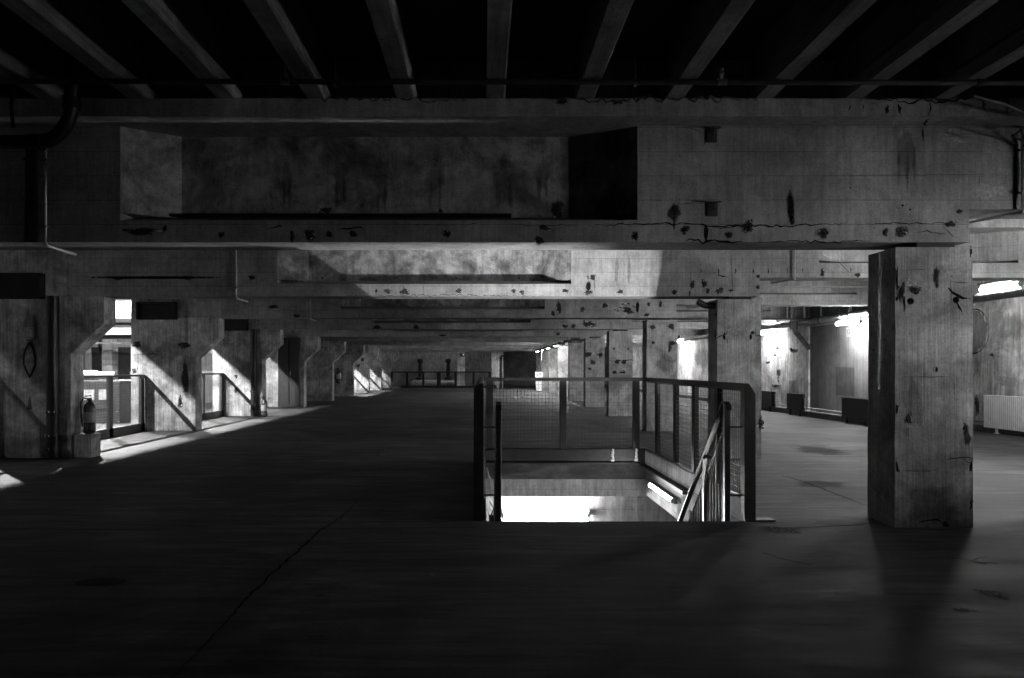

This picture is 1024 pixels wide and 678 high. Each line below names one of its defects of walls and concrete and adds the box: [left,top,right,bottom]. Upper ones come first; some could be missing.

crack [875,219,957,227]
spalling [895,267,922,301]
spalling [602,289,662,318]